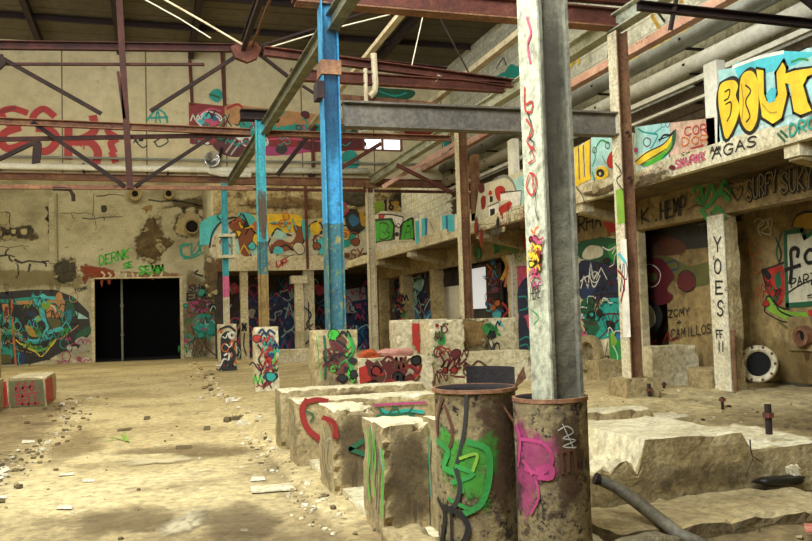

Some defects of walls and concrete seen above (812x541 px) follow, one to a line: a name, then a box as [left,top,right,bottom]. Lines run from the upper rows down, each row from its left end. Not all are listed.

rust [322,19,334,60]
rust [324,74,338,155]
peeling [0,224,39,241]
spalling [133,211,203,264]
crack [0,245,49,278]
spalling [53,257,77,287]
rust [552,411,584,510]